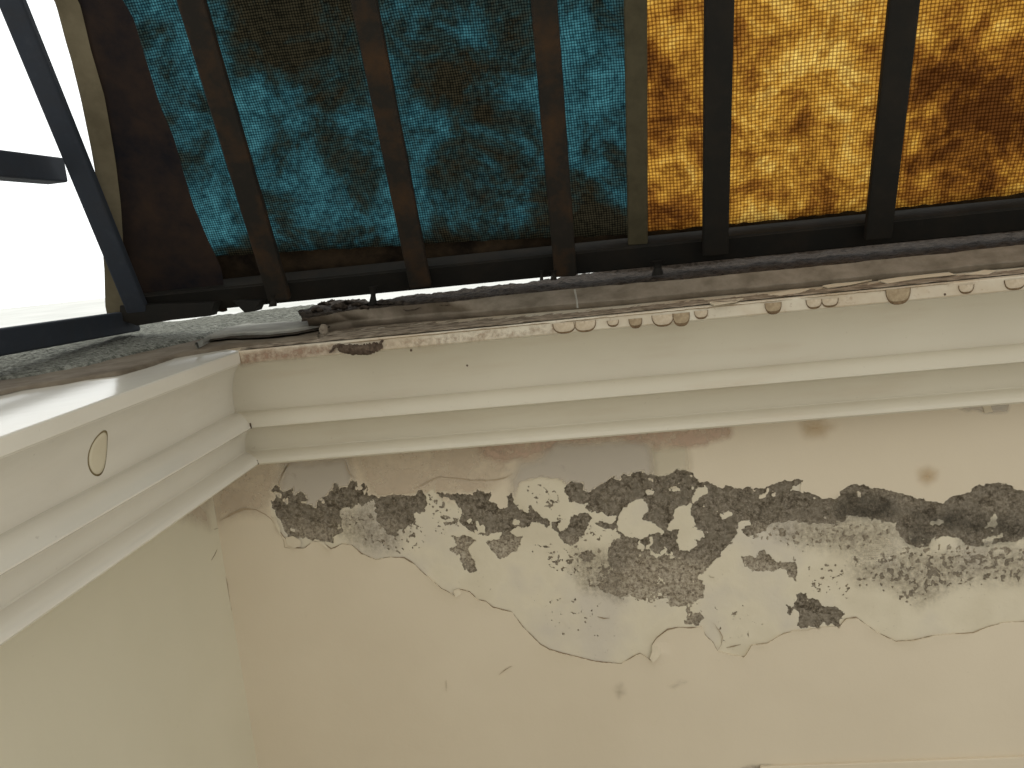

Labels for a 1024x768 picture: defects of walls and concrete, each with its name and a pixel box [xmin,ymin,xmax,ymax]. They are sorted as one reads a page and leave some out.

peeling [254,469,1024,664]